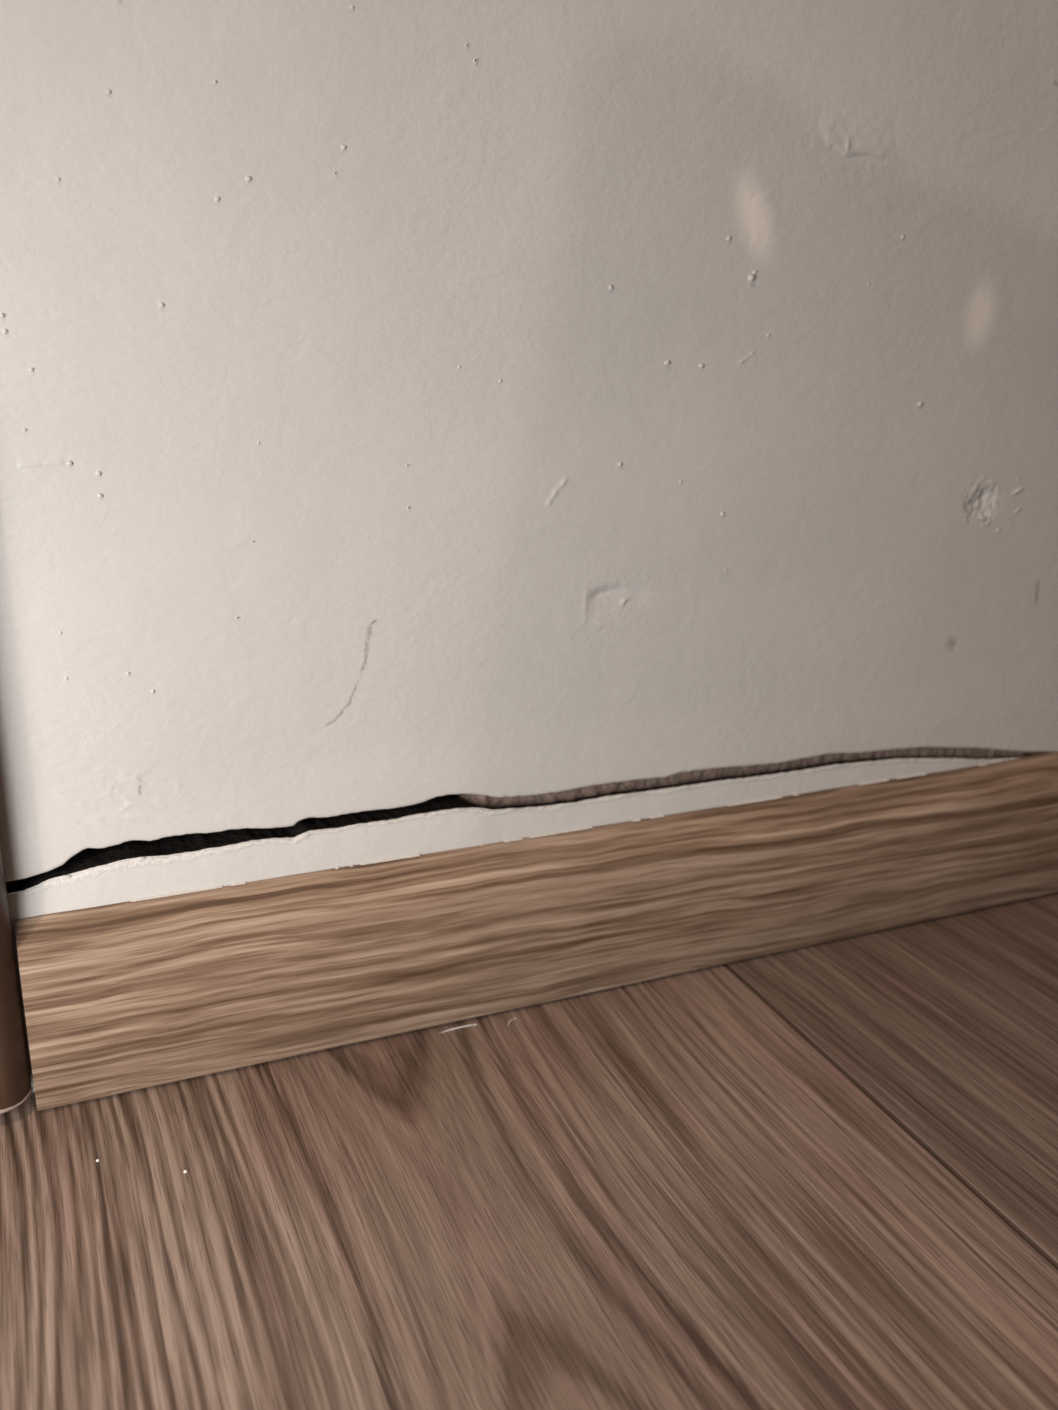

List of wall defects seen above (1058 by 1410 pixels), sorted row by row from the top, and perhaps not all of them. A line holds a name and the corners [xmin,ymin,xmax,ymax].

crack [6,747,1047,897]